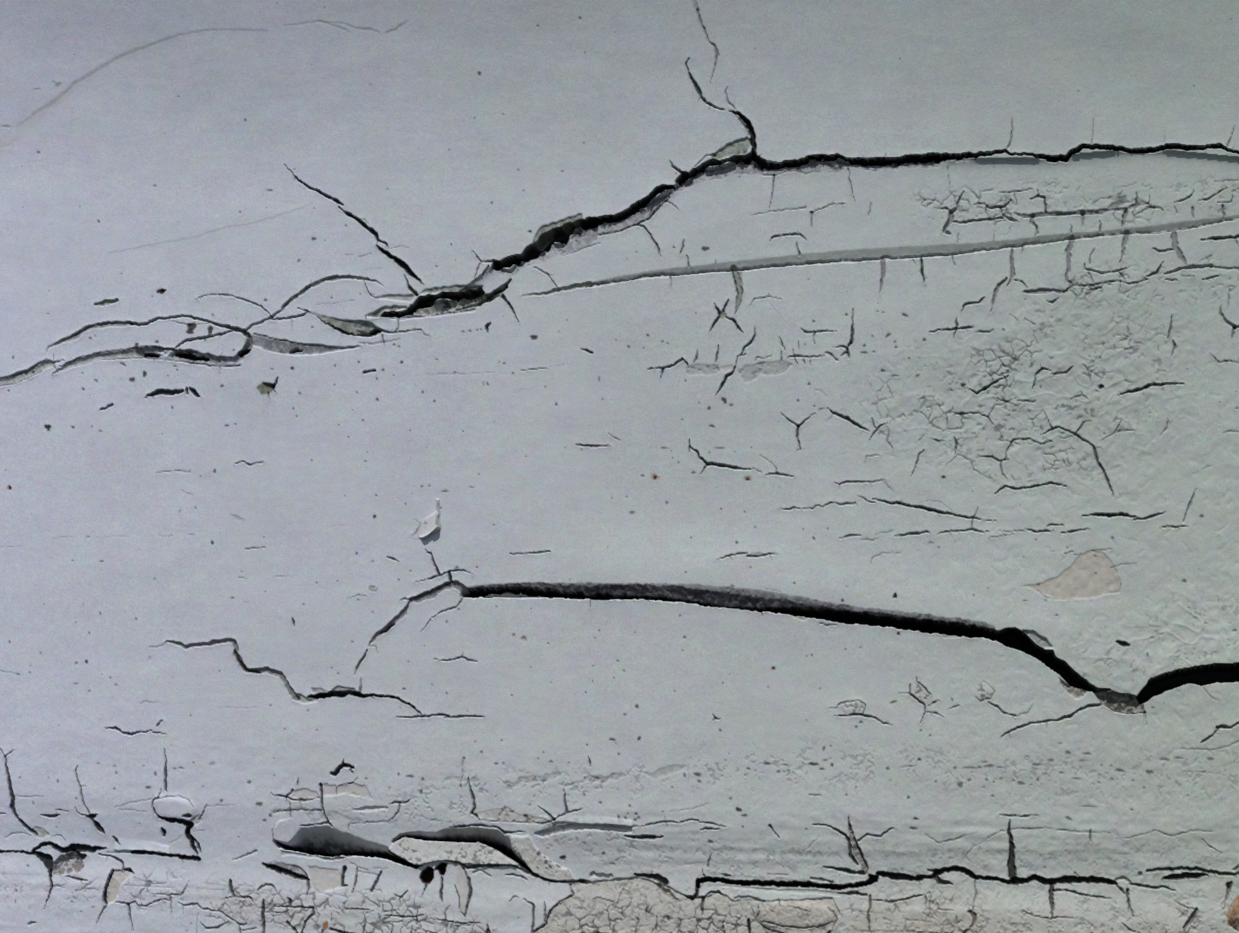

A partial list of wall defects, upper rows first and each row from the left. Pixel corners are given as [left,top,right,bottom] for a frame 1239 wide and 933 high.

crack [0,0,1239,565]
peeling [409,499,441,539]
peeling [1017,548,1138,602]
crack [148,548,1239,752]
crack [103,719,168,793]
crack [0,747,548,933]
crack [459,757,584,826]
peeling [260,814,838,933]
crack [682,812,1239,933]
rust [1226,894,1239,933]